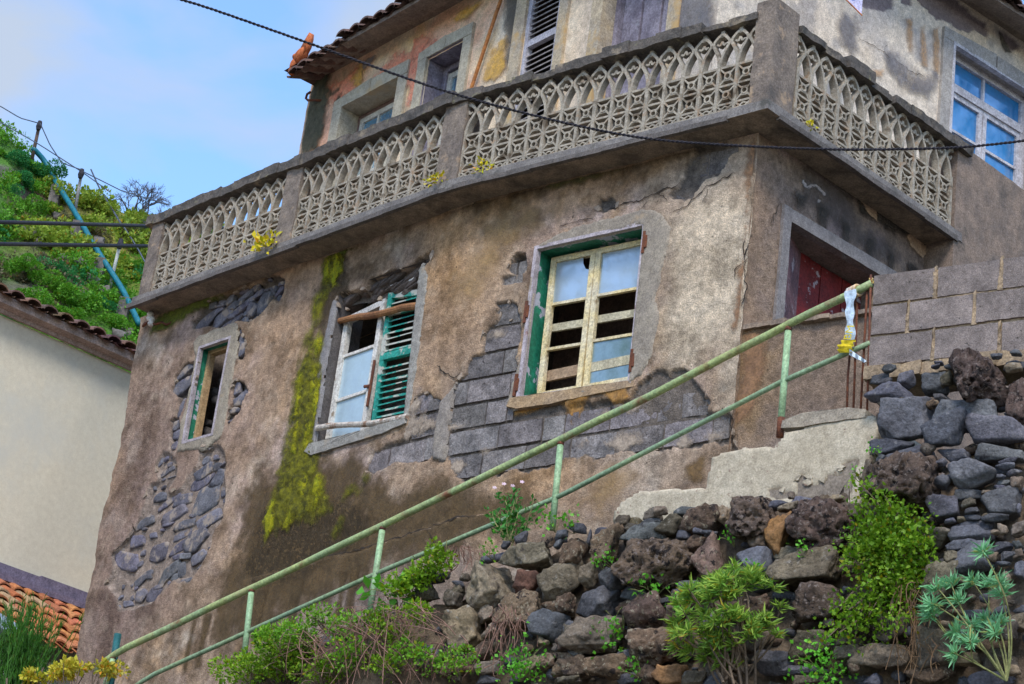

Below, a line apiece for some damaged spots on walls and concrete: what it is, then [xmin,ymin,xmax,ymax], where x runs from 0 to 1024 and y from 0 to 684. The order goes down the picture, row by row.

leakage [840,13,858,54]
leakage [887,53,938,97]
crack [558,172,735,228]
spalling [196,278,285,360]
leakage [318,256,359,364]
spalling [335,250,435,314]
spalling [504,261,527,285]
spalling [227,378,248,423]
spalling [368,300,738,479]
spalling [115,361,226,608]
flaking render [769,460,863,500]